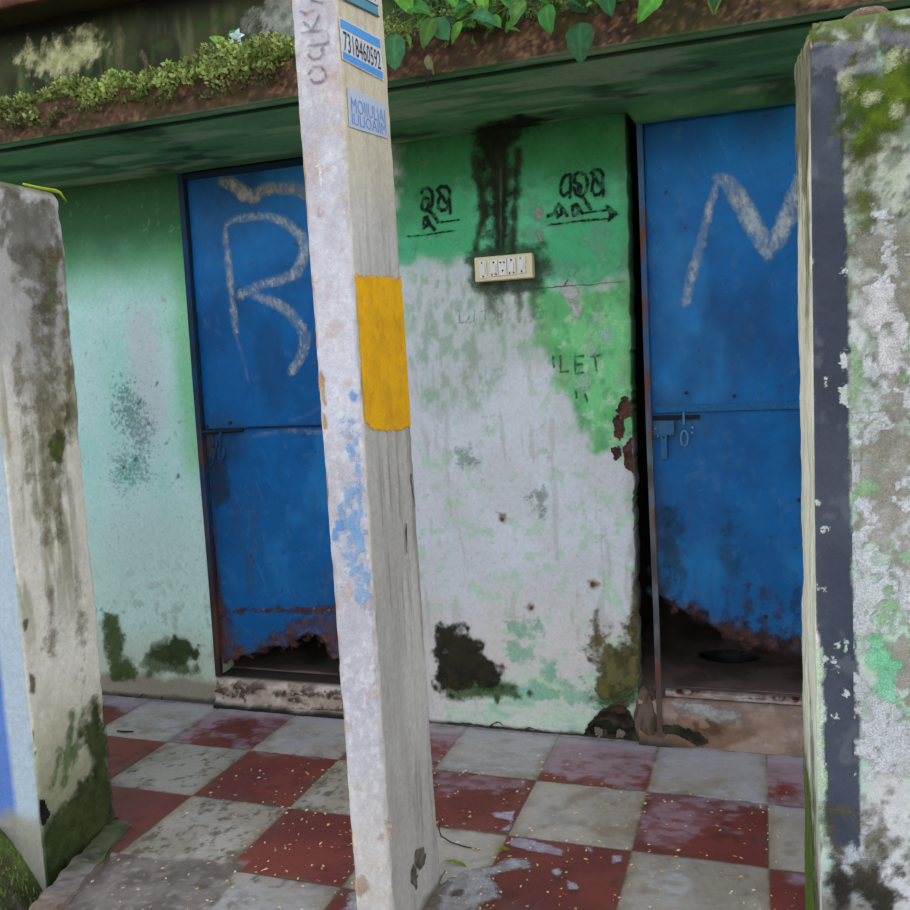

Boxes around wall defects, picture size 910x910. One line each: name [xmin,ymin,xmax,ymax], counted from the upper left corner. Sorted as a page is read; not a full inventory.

leakage [466,114,553,315]
leakage [0,187,75,449]
peeling [561,282,582,318]
peeling [611,378,634,473]
leakage [41,459,64,545]
peeling [817,200,910,794]
leakage [102,612,199,681]
rust [234,605,339,653]
leakage [431,621,532,704]
leakage [587,585,639,708]
rust [671,600,802,657]
leakage [52,708,84,787]